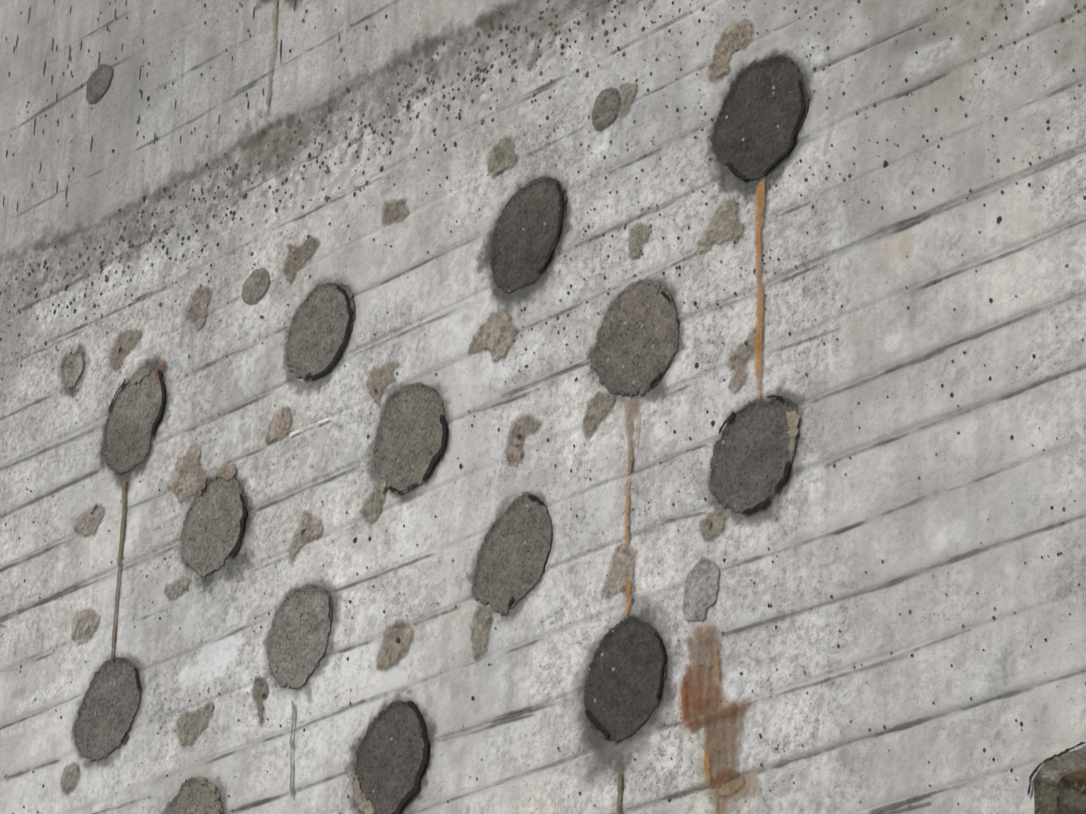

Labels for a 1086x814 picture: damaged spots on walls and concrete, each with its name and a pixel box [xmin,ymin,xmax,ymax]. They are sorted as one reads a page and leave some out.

leakage [709,51,811,197]
leakage [479,193,570,306]
corrosion [754,180,765,398]
leakage [139,358,164,379]
leakage [284,344,341,388]
leakage [111,393,168,660]
leakage [201,496,251,592]
leakage [395,447,448,502]
corrosion [624,399,640,545]
leakage [712,476,792,522]
corrosion [680,626,755,814]